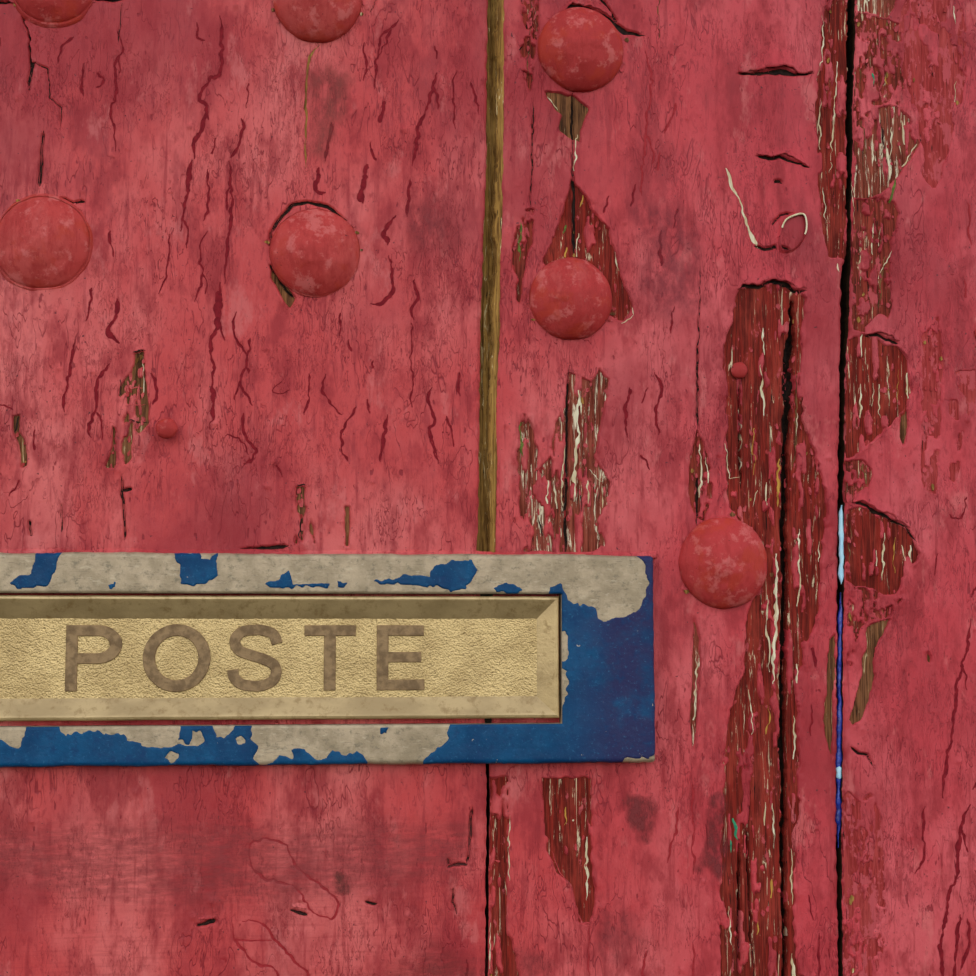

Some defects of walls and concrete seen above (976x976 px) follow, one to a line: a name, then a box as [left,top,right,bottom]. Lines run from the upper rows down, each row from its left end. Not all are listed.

crack [738,44,813,76]
crack [158,15,399,477]
crack [370,46,479,464]
peeling [543,183,634,323]
crack [725,168,807,294]
crack [62,288,120,440]
peeling [815,0,976,724]
peeling [0,371,649,622]
peeling [720,284,827,976]
peeling [0,727,26,748]
peeling [542,776,596,926]
crack [937,782,976,976]